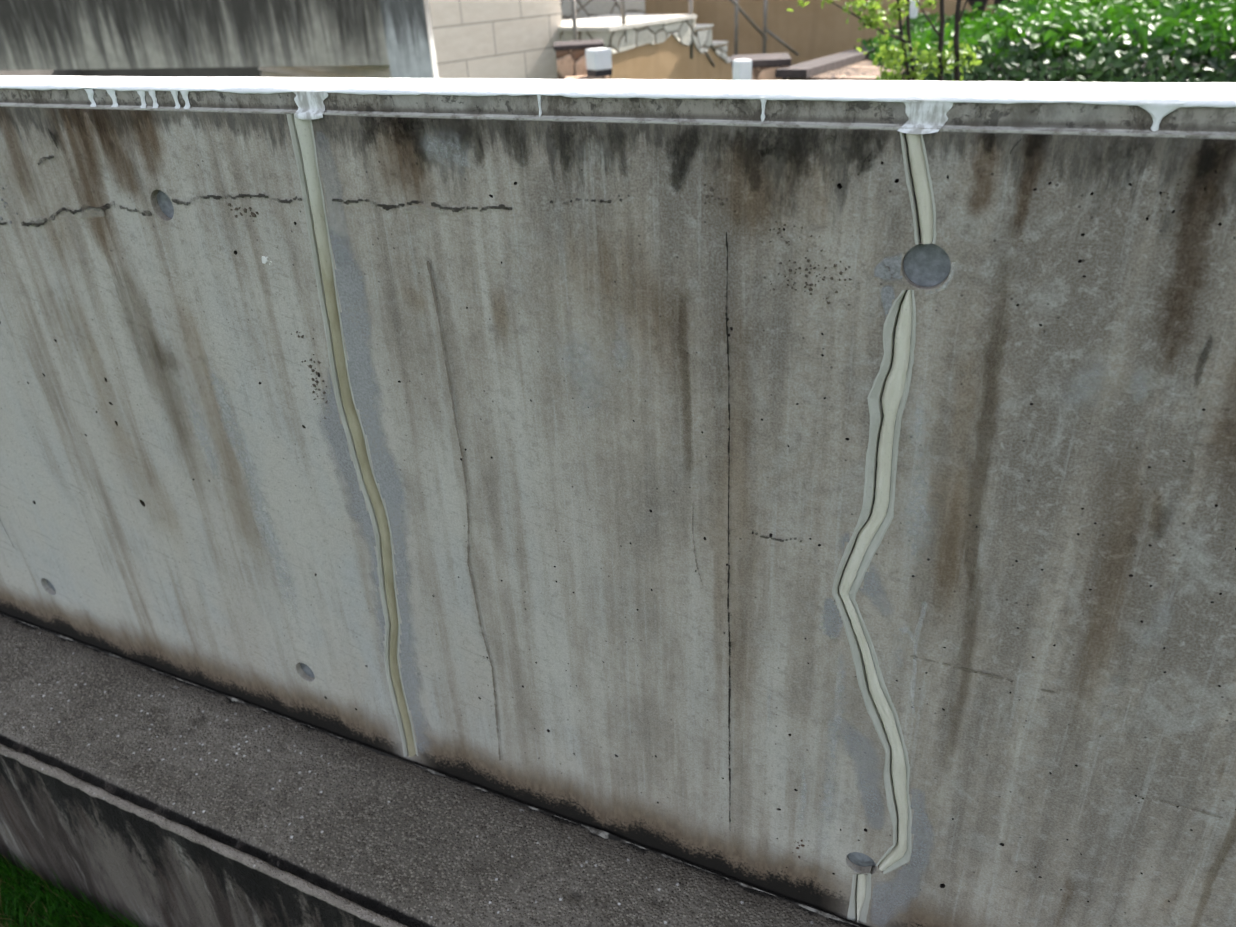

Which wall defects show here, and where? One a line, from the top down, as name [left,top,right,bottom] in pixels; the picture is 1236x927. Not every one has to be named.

crack [0,114,512,761]
crack [692,232,802,822]
crack [832,290,916,923]
crack [900,128,936,245]